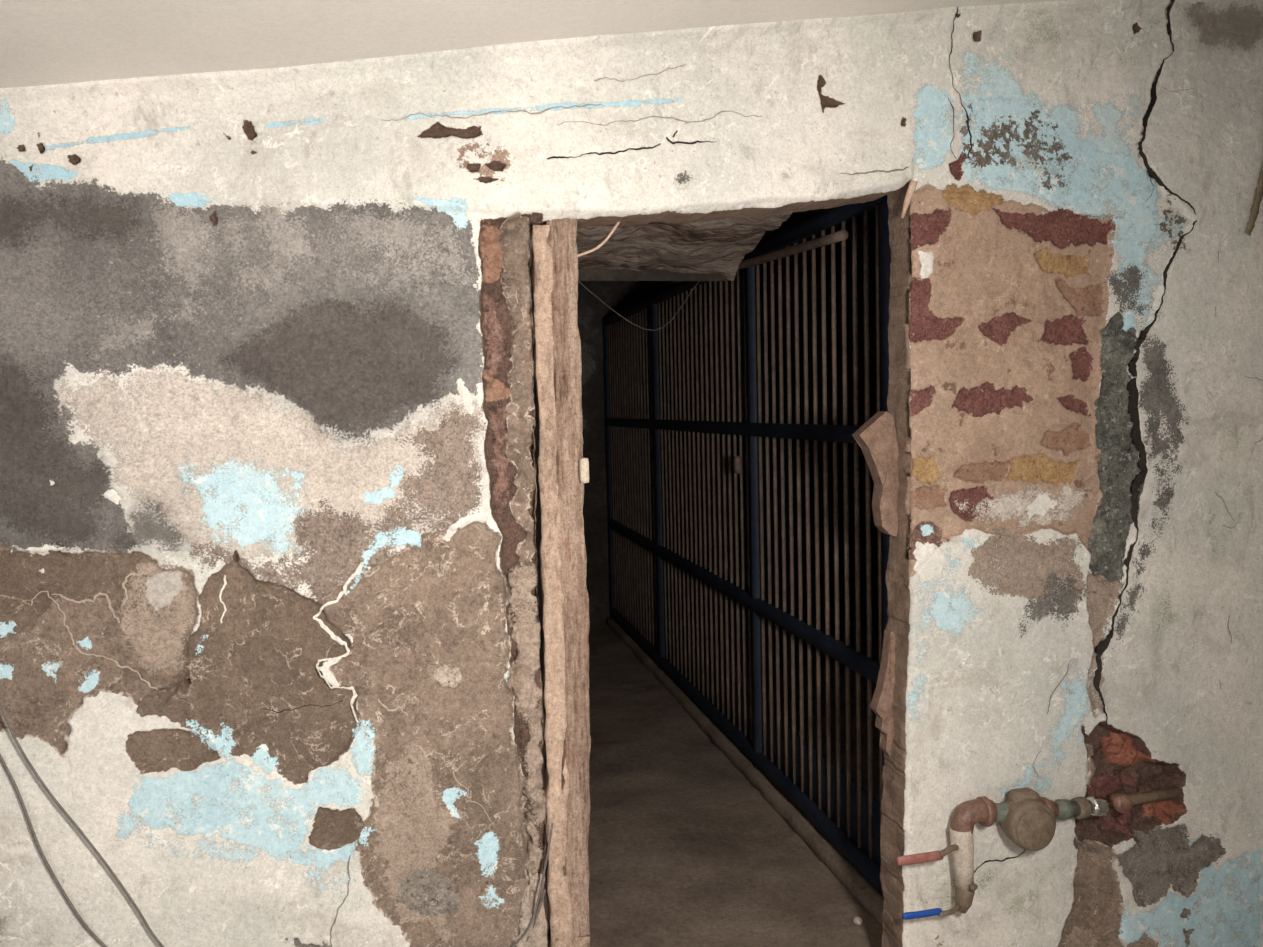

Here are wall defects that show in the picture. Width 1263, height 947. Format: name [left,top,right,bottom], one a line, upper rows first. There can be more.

leakage [0,155,489,563]
leakage [265,117,327,129]
spalling [418,122,483,139]
spalling [467,161,507,184]
crack [381,64,762,160]
crack [839,167,909,175]
flaking render [907,150,1119,584]
crack [1047,0,1197,725]
spalling [0,212,547,947]
spalling [1058,572,1226,947]